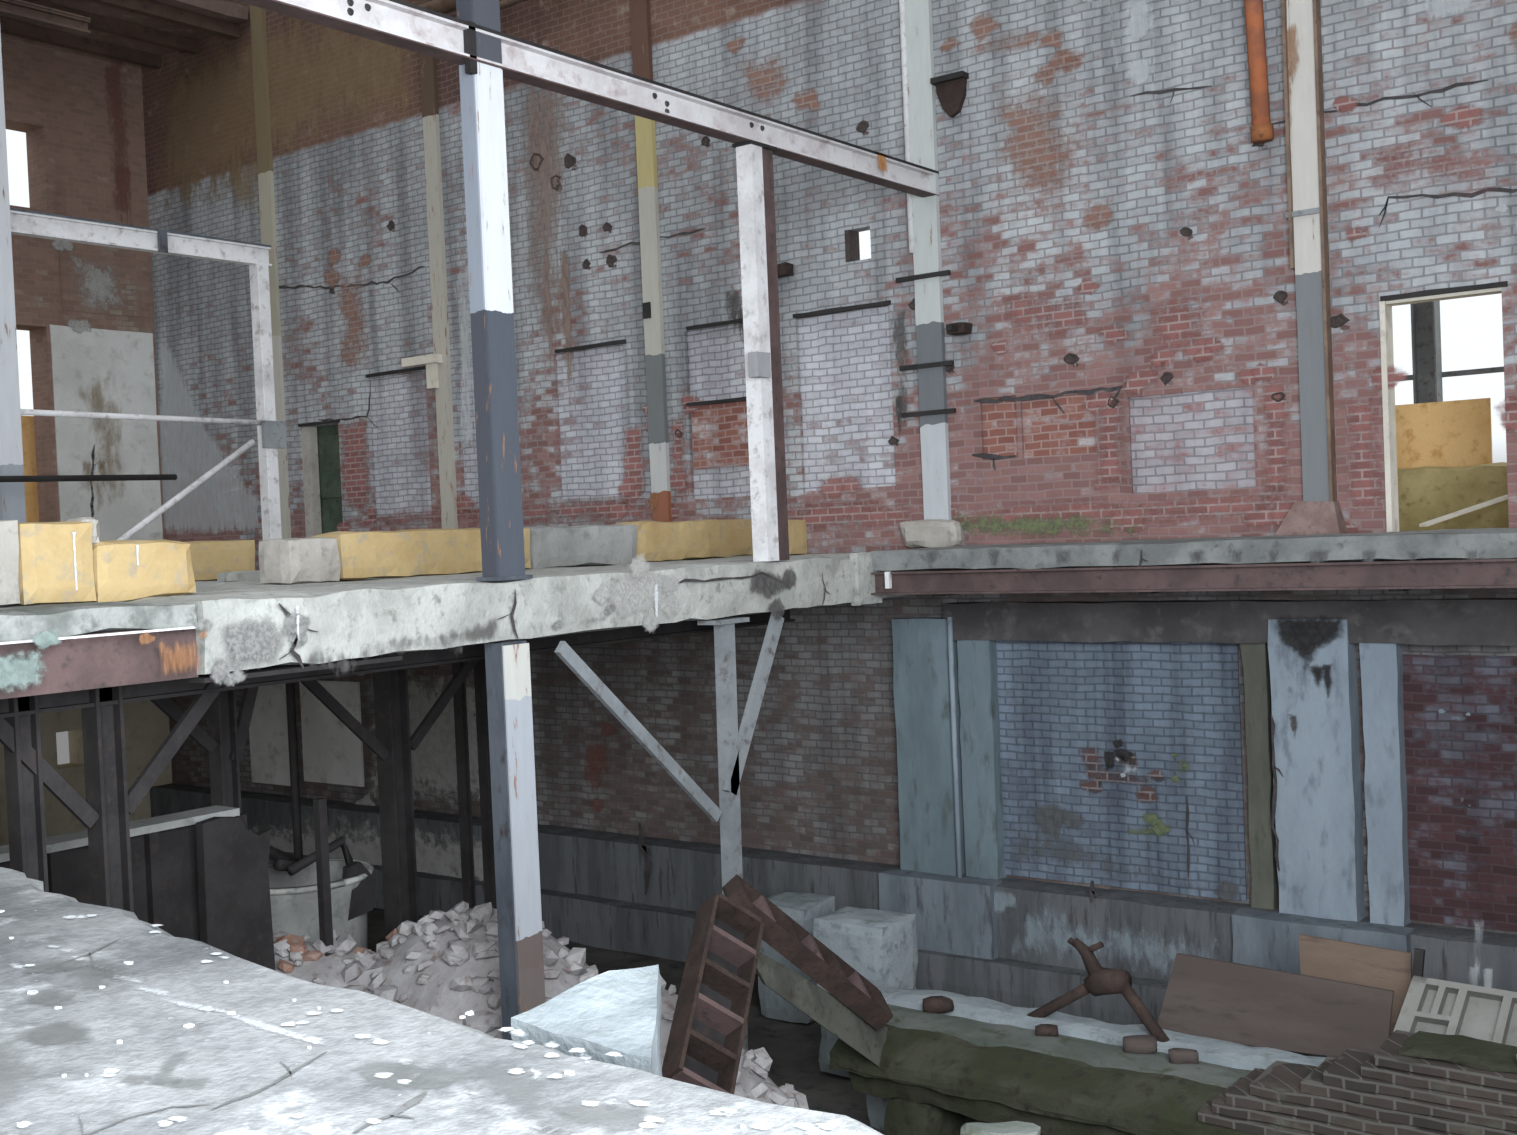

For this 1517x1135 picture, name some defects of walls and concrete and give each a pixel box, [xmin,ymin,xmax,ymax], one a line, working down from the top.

crack [1324,80,1488,113]
spalling [856,120,870,135]
spalling [529,153,577,192]
crack [1379,187,1517,227]
spalling [579,222,613,237]
spalling [582,254,617,270]
crack [279,266,425,294]
peeling [1372,366,1407,389]
peeling [1496,397,1517,432]
rust [140,632,207,673]
spalling [1081,739,1180,836]
crack [78,1051,327,1135]